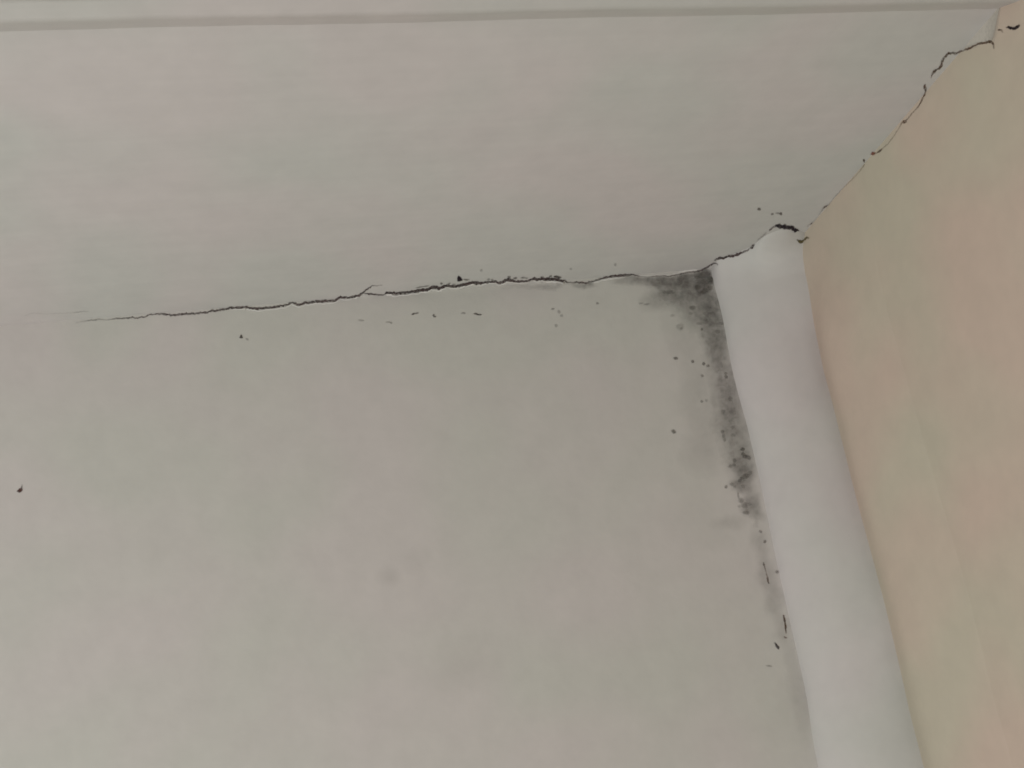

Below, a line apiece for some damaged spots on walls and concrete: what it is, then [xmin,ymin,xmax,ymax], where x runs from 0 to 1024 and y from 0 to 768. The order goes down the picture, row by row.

crack [902,40,994,123]
crack [122,245,754,319]
water stain [652,270,713,293]